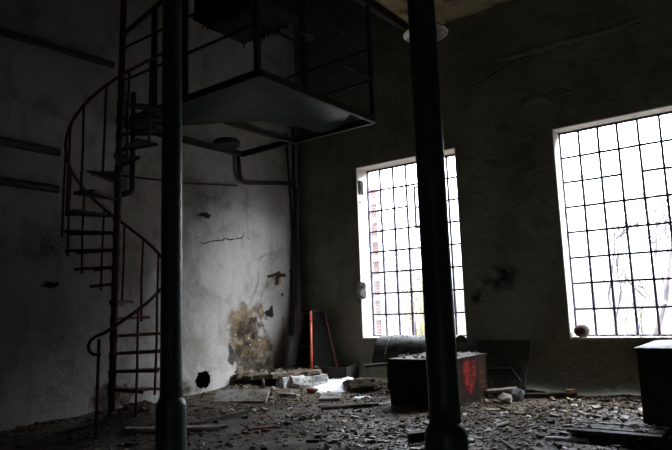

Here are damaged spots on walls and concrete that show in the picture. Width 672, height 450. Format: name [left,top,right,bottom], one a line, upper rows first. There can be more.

crack [195,233,251,244]
spalling [194,369,213,391]